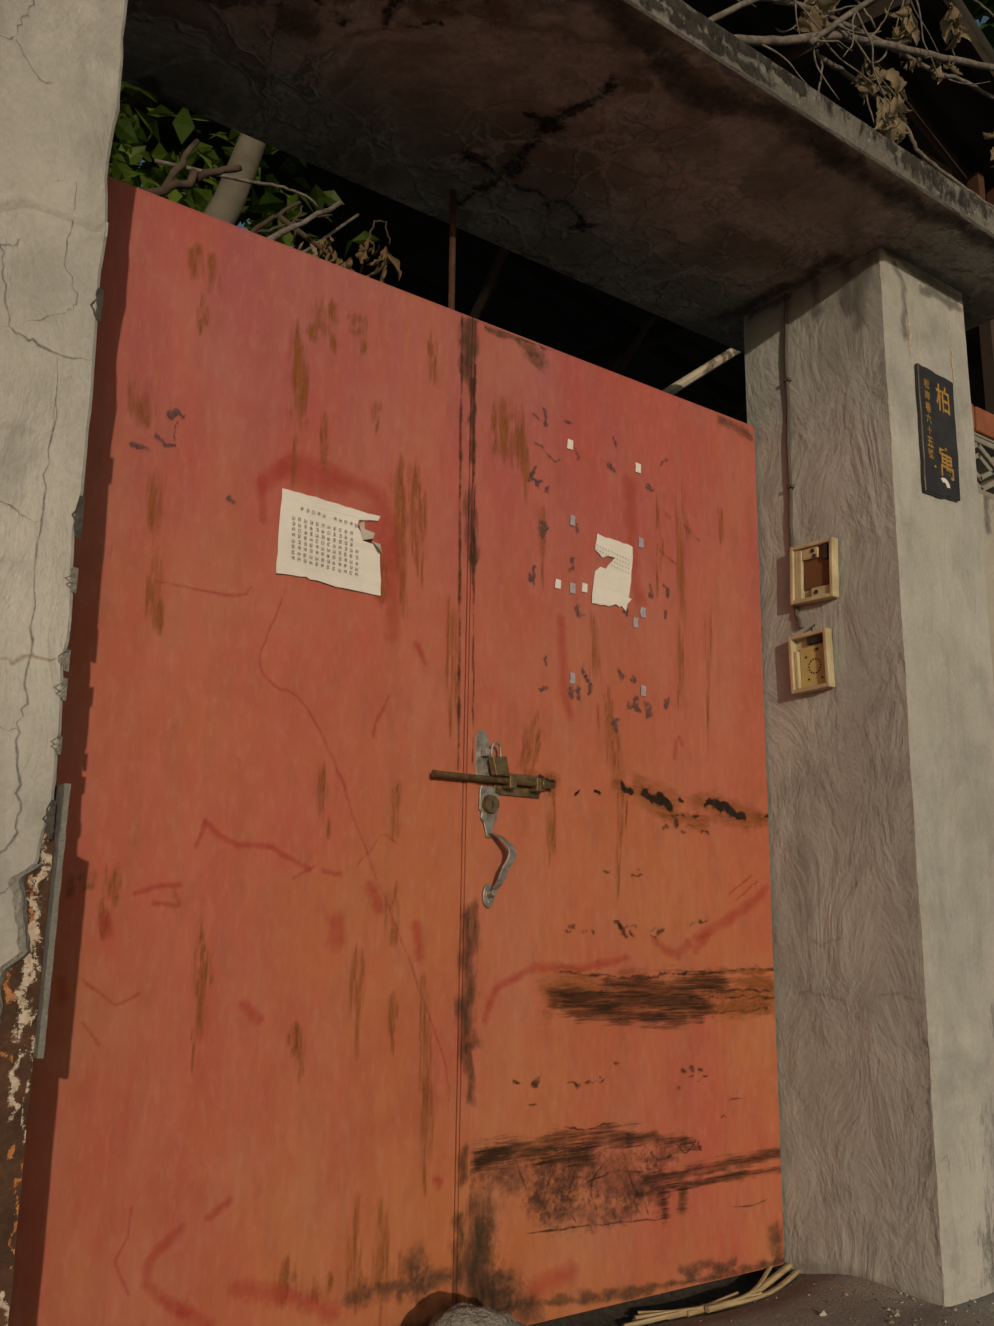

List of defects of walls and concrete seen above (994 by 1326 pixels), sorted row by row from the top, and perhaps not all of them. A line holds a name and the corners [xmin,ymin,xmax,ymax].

water stain [449,74,618,231]
water stain [599,0,994,247]
water stain [720,236,994,325]
corrosion [293,302,336,408]
corrosion [460,405,475,507]
corrosion [380,465,426,599]
corrosion [447,523,475,728]
spalling [0,783,71,1269]
corrosion [547,969,774,1023]
corrosion [474,1123,781,1221]
spalling [0,1291,9,1326]
corrosion [474,1222,785,1319]